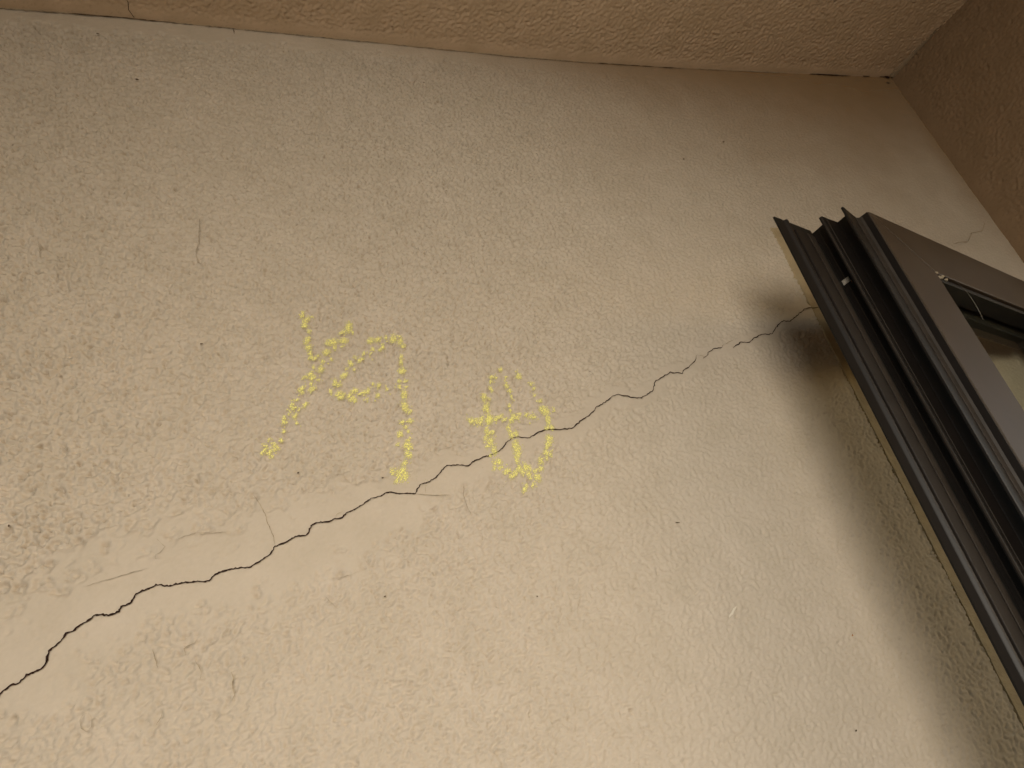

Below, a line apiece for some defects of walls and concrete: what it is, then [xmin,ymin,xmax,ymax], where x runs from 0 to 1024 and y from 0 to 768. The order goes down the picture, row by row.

crack [0,307,818,694]